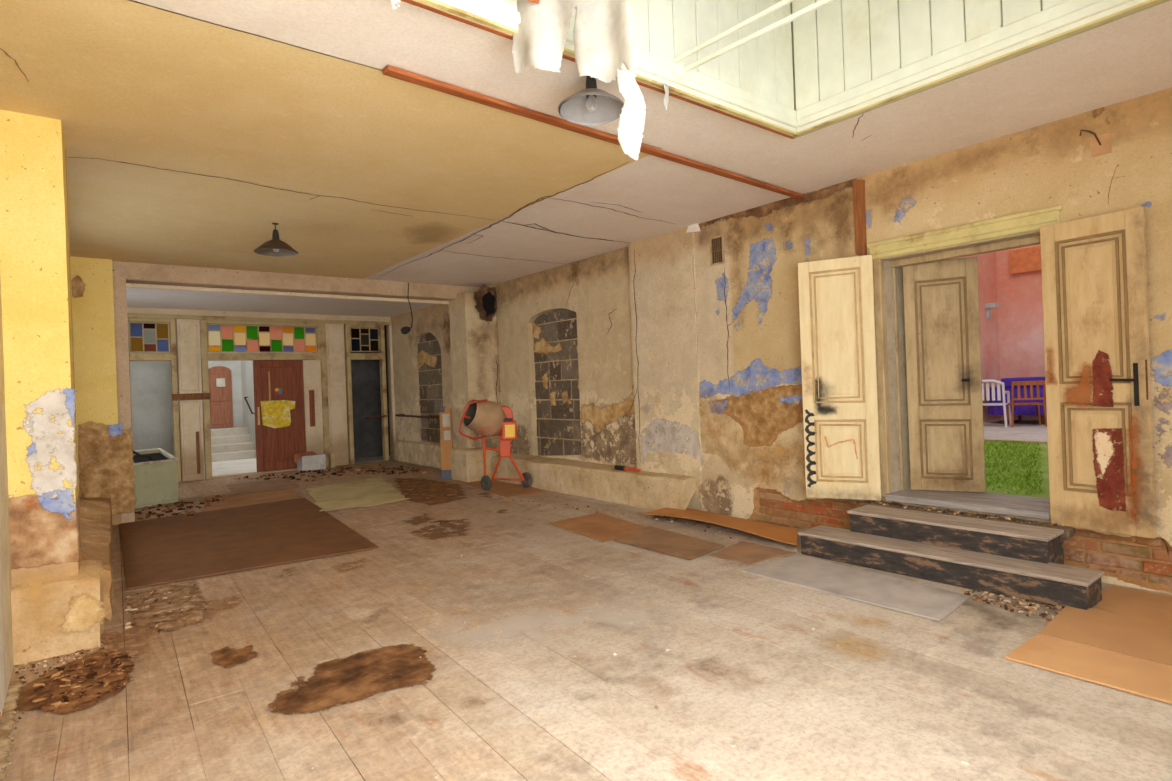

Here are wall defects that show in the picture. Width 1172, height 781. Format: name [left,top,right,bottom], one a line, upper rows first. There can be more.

peeling [686,178,857,332]
crack [65,150,698,532]
flaking render [533,321,562,355]
crack [724,267,734,379]
flaking render [8,387,137,569]
flaking render [542,372,635,433]
peeling [640,418,704,466]
flaking render [699,358,803,445]
peeling [1094,431,1115,475]
peeling [1151,350,1172,468]
flaking render [1063,531,1172,587]